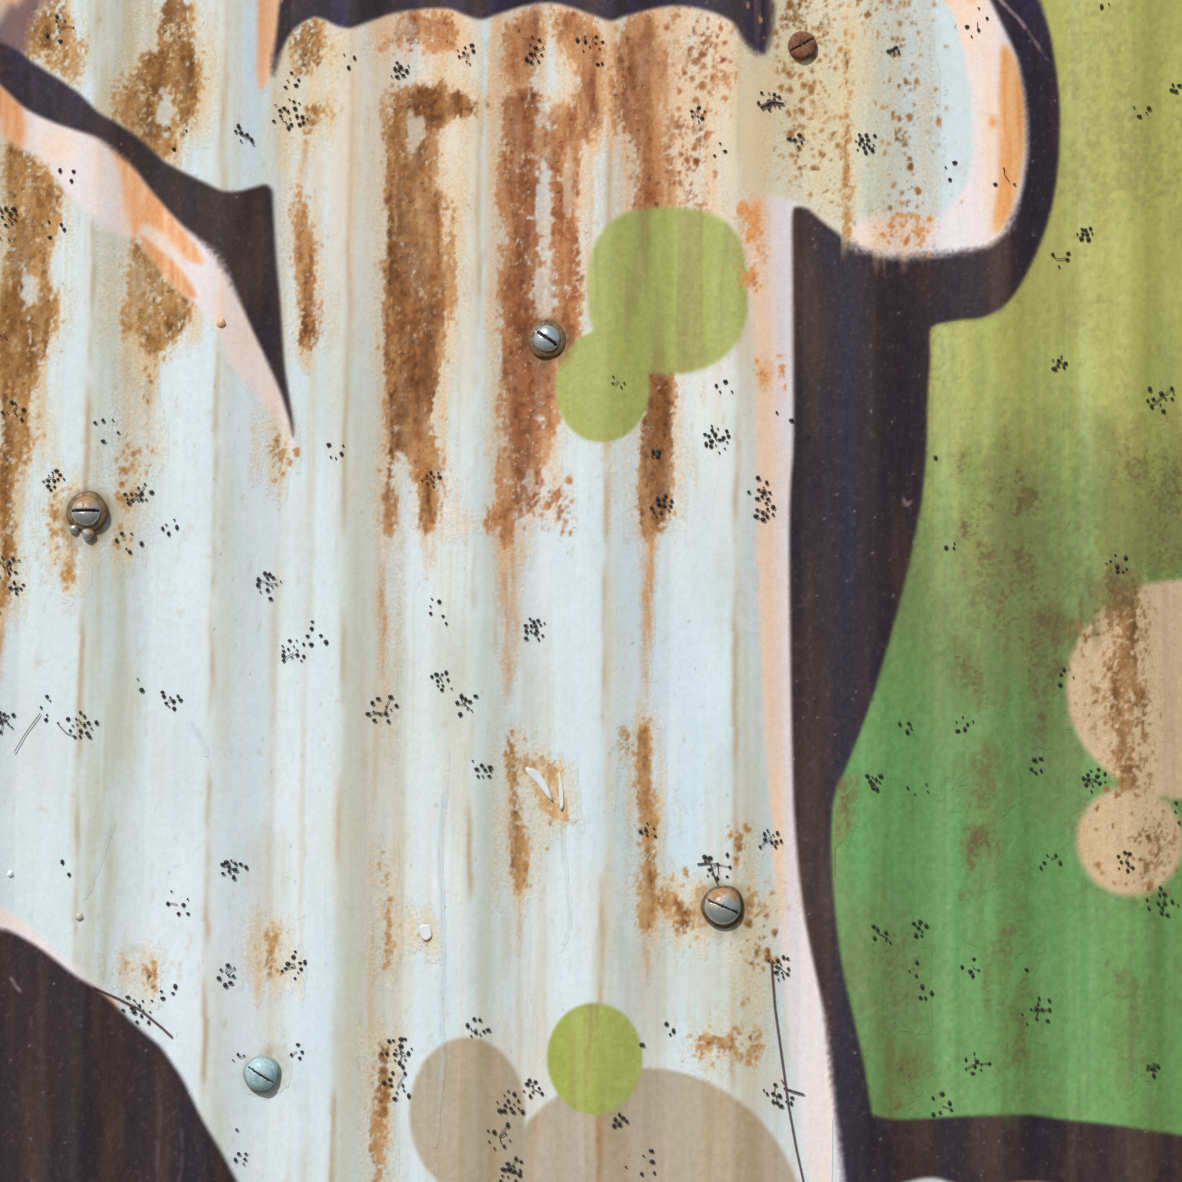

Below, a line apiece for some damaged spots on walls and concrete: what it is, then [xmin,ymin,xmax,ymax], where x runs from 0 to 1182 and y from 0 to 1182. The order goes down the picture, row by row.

rust [29,0,224,172]
rust [0,139,213,689]
rust [273,0,964,957]
rust [600,376,803,1086]
rust [1065,563,1182,909]